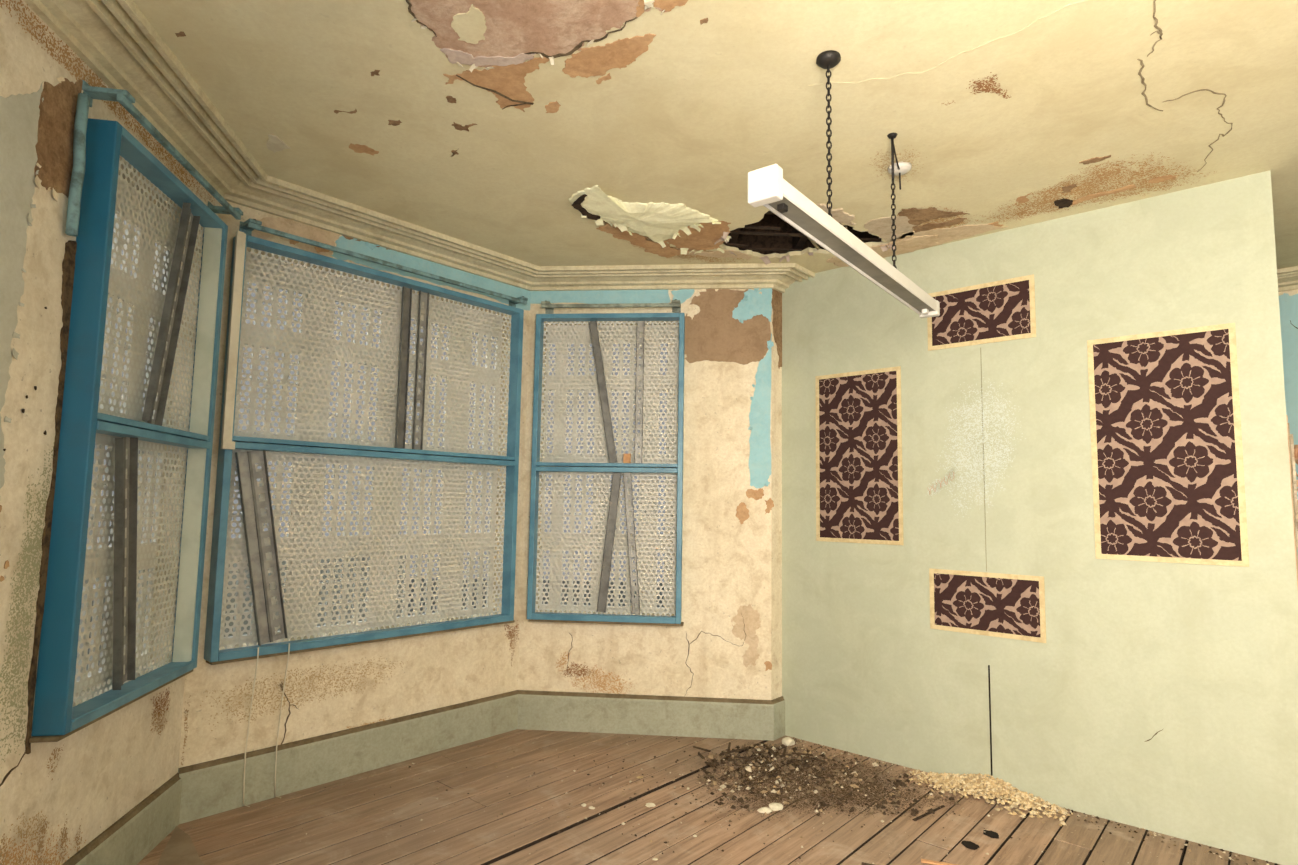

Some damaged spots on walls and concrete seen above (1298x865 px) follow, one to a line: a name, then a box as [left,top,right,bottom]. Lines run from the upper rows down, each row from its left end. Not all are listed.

flaking render [406,0,688,113]
crack [1137,0,1233,170]
peeling [0,76,83,489]
flaking render [668,214,826,260]
flaking render [838,207,1008,245]
leakage [913,152,1215,231]
flaking render [252,217,782,524]
crack [0,751,26,786]